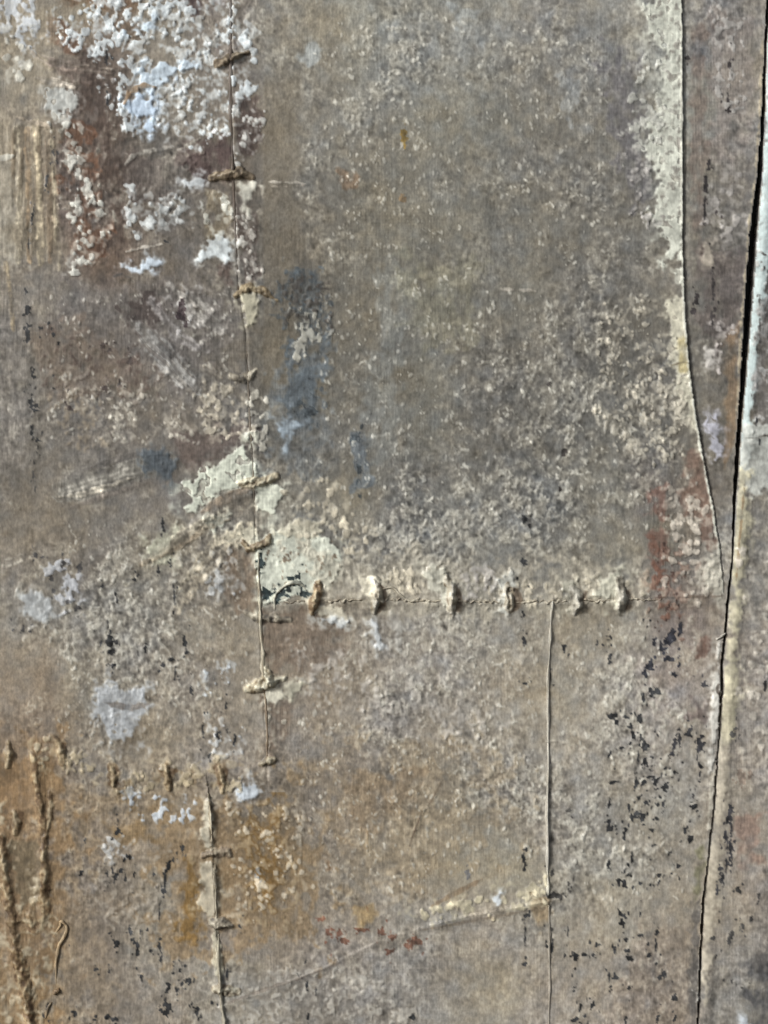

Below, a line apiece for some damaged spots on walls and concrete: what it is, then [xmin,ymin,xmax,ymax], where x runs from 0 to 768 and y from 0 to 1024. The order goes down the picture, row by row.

peeling [0,0,267,165]
peeling [34,76,115,286]
peeling [113,166,267,286]
peeling [22,286,117,360]
corrosion [640,447,716,633]
crack [688,487,746,600]
peeling [9,340,581,983]
crack [714,682,722,696]